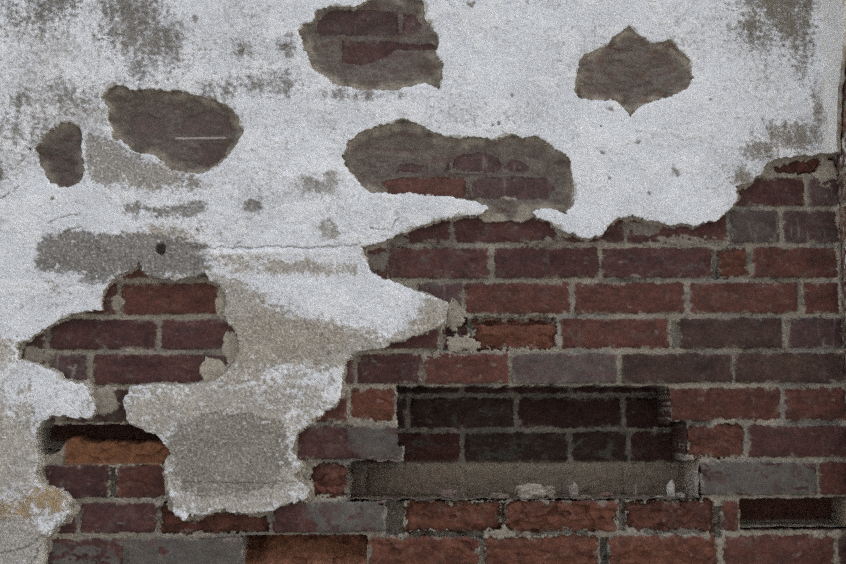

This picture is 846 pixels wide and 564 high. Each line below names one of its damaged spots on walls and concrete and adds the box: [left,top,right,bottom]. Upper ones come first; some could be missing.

flaking render [299,0,444,91]
flaking render [574,26,694,117]
damp [738,0,814,70]
flaking render [35,85,244,219]
damp [745,94,823,160]
crack [191,217,400,250]
spalling [0,118,846,564]